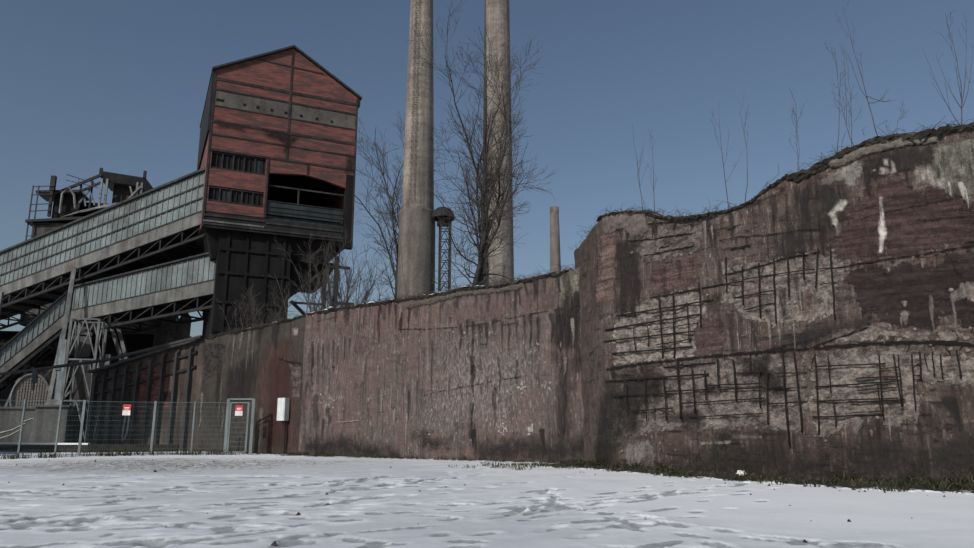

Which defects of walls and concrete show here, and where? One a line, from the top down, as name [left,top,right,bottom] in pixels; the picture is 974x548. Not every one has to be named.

damp [774,183,847,258]
damp [862,146,969,252]
peeling [556,270,579,301]
spalling [596,139,974,465]
damp [439,276,663,464]